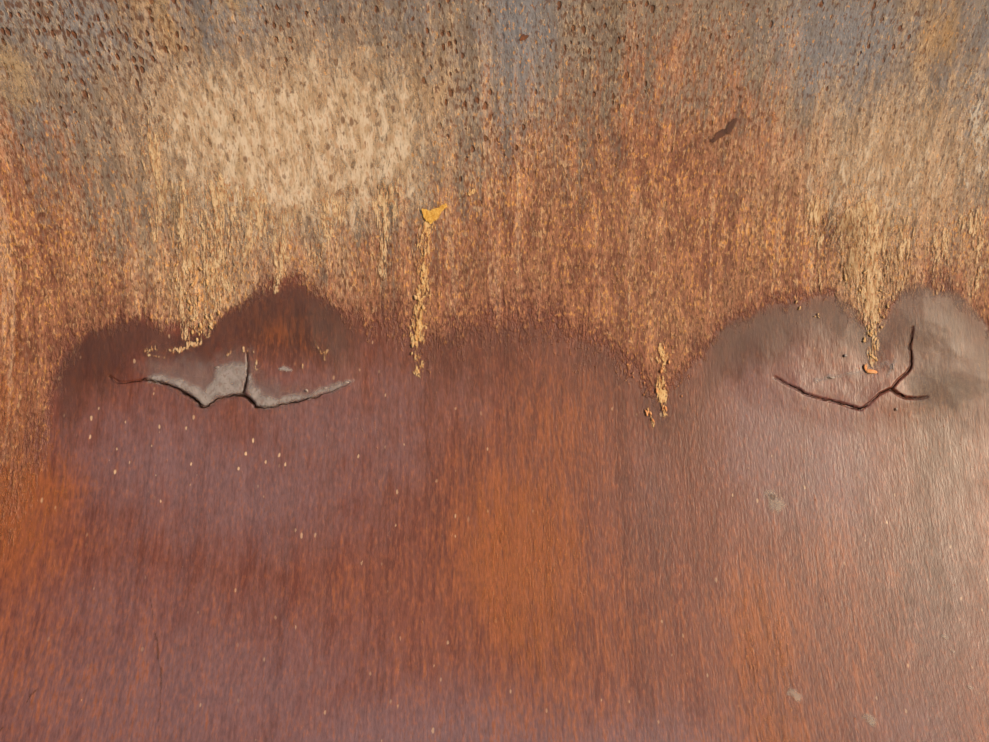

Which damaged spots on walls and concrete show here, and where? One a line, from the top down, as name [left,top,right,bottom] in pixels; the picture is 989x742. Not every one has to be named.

damp [715,66,989,380]
corrosion [409,220,436,377]
crack [109,356,347,408]
corrosion [632,343,670,429]
crack [779,329,926,410]